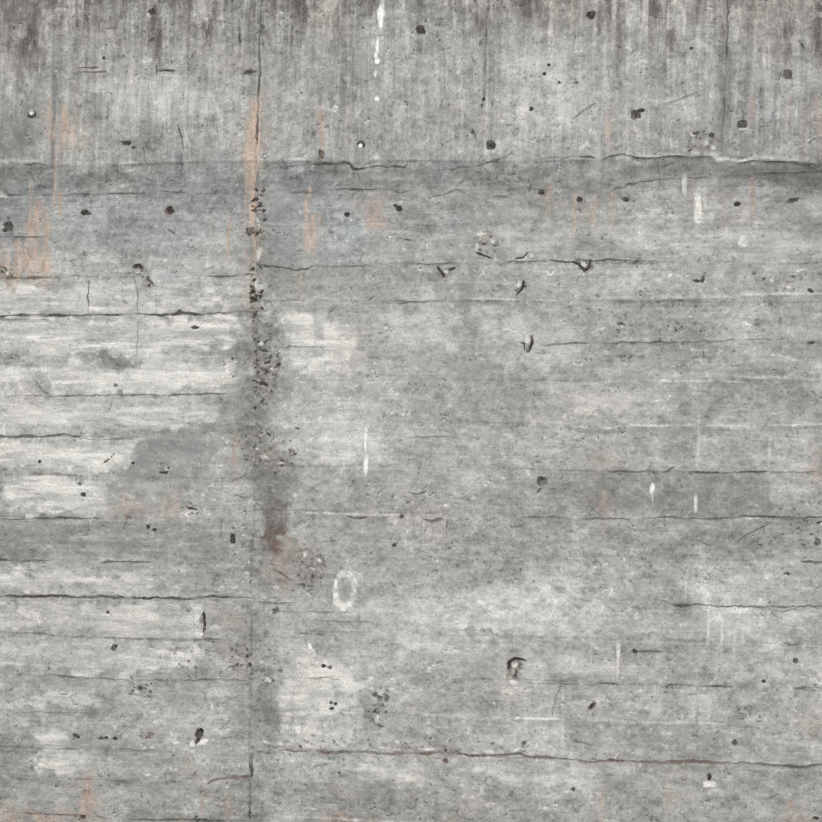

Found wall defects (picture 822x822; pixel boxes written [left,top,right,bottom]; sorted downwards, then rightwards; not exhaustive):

corrosion [0,80,96,298]
crack [0,264,259,358]
damp [0,0,386,203]
corrosion [226,87,281,336]
damp [261,179,303,305]
damp [403,0,822,242]
crack [538,0,822,192]
damp [232,329,315,518]
crack [0,567,375,624]
corrosion [248,483,307,598]
damp [233,676,289,757]
crack [278,747,822,770]